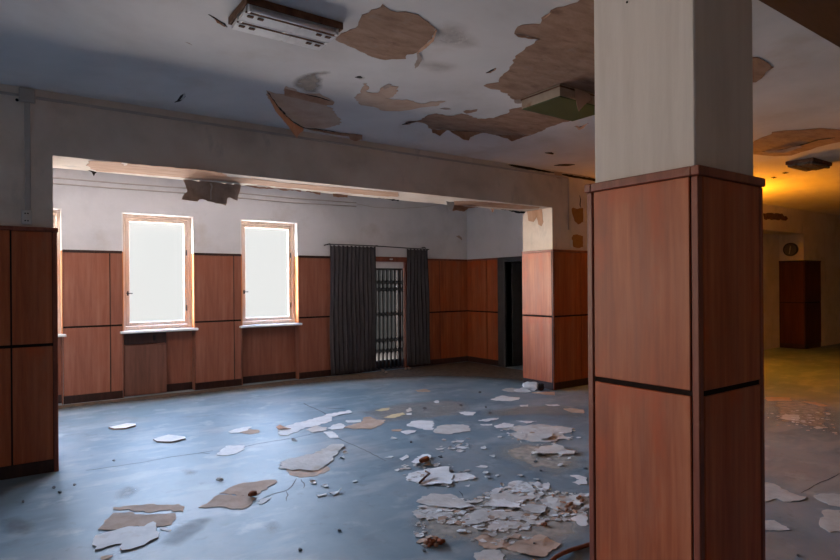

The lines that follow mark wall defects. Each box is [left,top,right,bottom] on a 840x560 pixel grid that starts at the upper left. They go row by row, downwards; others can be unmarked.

peeling [335,4,437,68]
water stain [296,73,319,92]
peeling [354,0,595,141]
peeling [752,57,774,83]
peeling [753,128,840,156]
peeling [572,208,583,224]